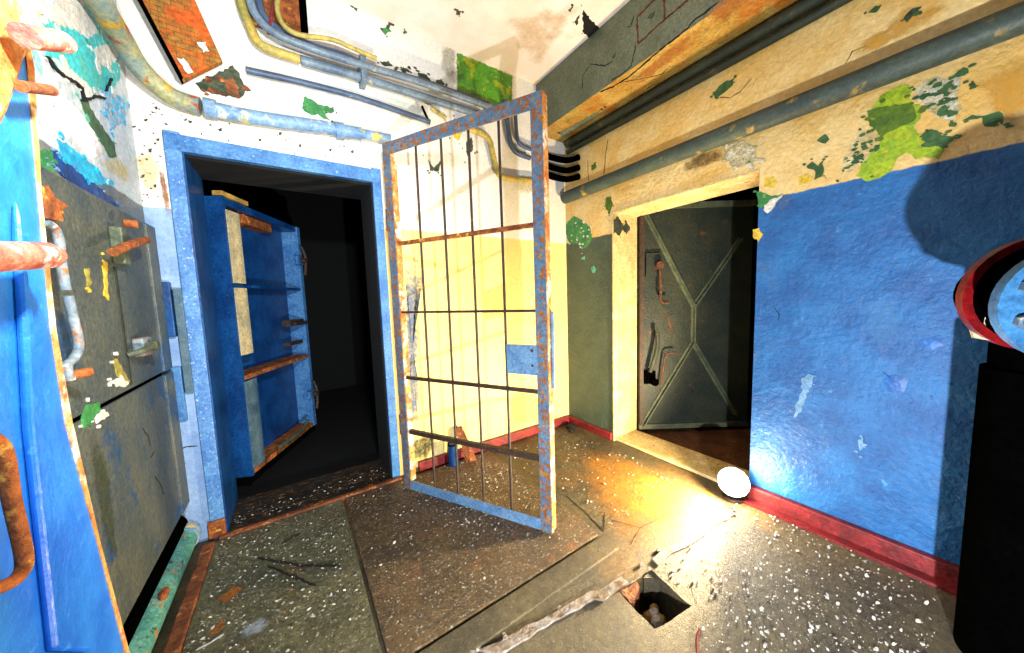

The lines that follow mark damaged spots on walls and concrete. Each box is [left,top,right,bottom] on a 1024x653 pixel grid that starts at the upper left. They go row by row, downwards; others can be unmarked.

spalling [568,4,599,38]
crack [45,55,113,102]
peeling [39,0,192,208]
peeling [302,96,337,122]
peeling [798,63,1013,185]
peeling [565,214,596,273]
spalling [470,506,736,653]